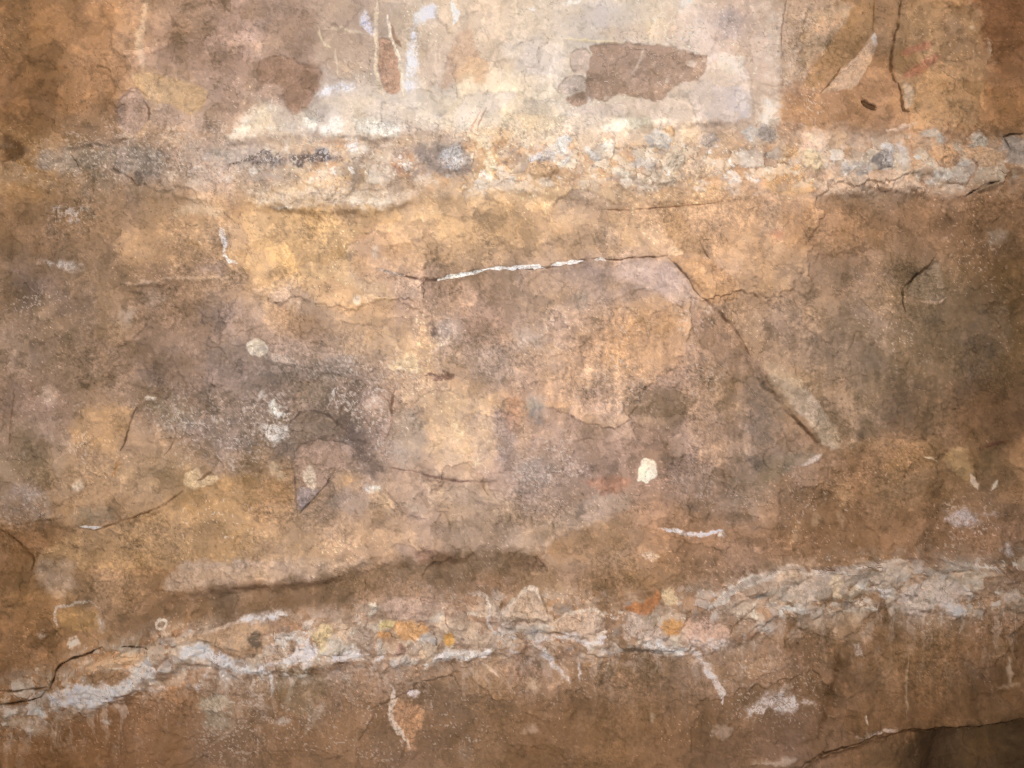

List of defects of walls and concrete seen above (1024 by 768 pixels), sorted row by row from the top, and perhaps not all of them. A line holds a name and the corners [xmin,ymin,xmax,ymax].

spalling [557,40,709,107]
crack [872,0,911,113]
crack [376,240,826,449]
crack [0,490,183,571]
water stain [65,635,82,650]
crack [0,645,148,707]
water stain [44,654,169,726]
water stain [235,609,295,627]
water stain [173,634,387,698]
water stain [641,634,818,721]
water stain [846,575,978,623]
crack [802,652,1024,768]